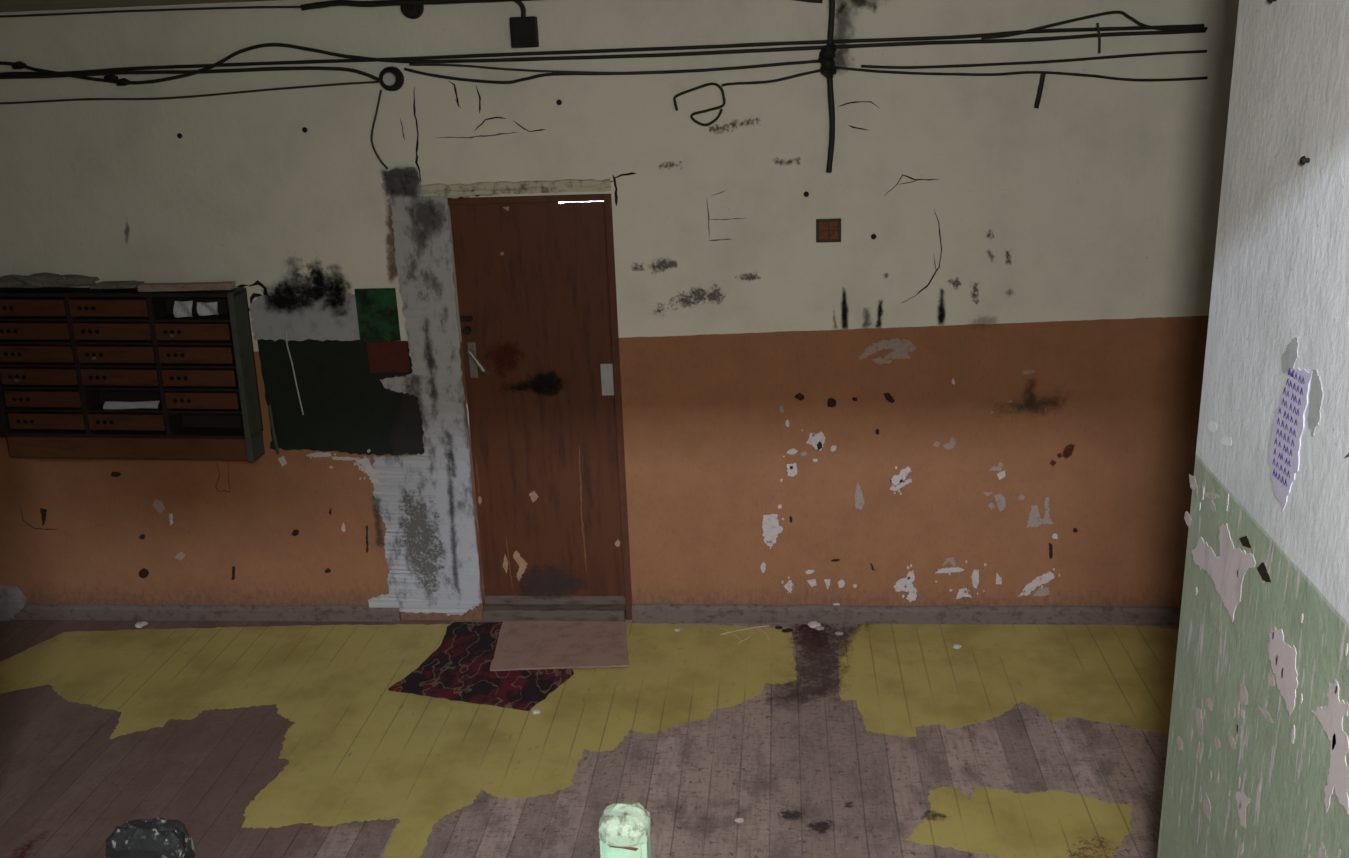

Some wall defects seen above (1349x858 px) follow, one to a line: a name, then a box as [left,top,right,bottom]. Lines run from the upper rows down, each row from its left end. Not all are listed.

peeling [779,393,836,482]
peeling [760,504,793,573]
peeling [781,570,857,605]
peeling [854,482,865,510]
peeling [889,465,913,495]
peeling [893,564,918,603]
peeling [934,557,1002,600]
peeling [983,462,1078,597]
peeling [1184,474,1271,622]
peeling [1268,627,1349,814]
peeling [1176,682,1274,857]